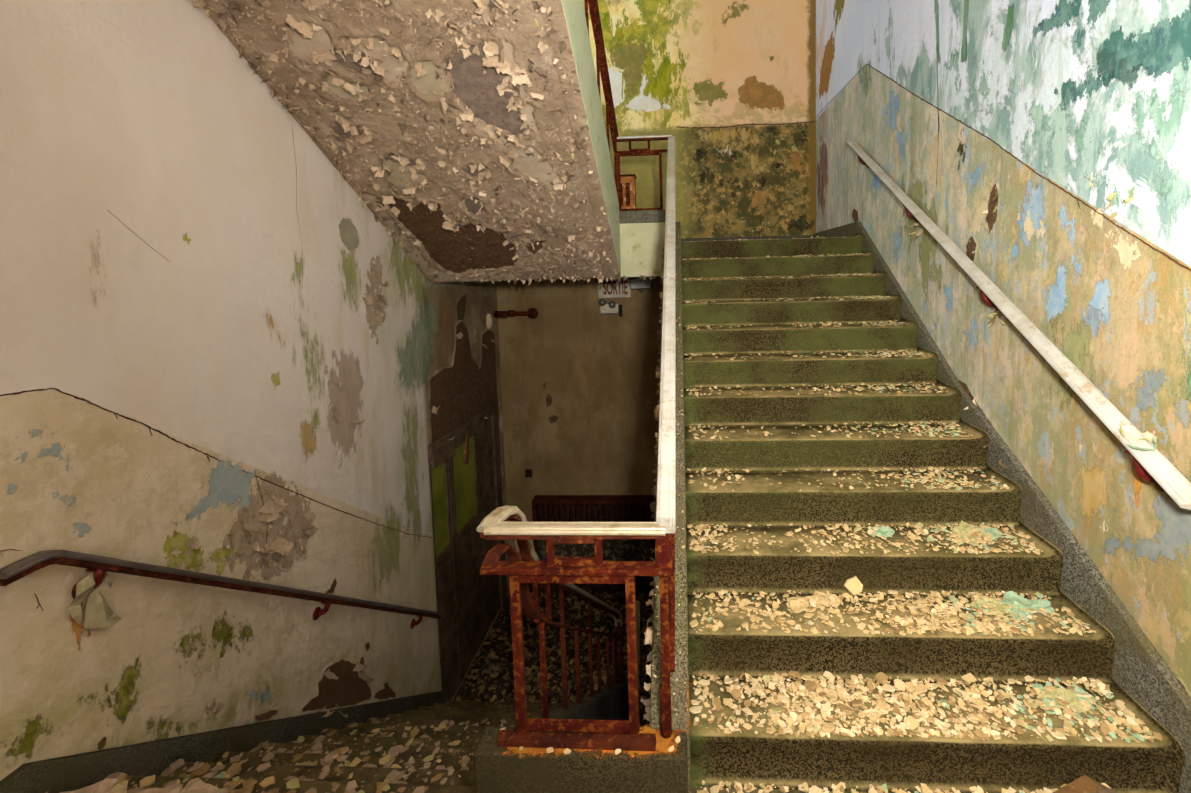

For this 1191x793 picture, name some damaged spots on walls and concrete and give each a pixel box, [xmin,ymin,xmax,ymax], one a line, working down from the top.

spalling [689,76,785,111]
spalling [192,0,671,519]
peeling [1042,172,1141,321]
peeling [1080,278,1112,339]
spalling [957,376,1015,455]
peeling [1120,425,1157,451]
peeling [1129,368,1168,411]
peeling [163,459,318,581]
peeling [1091,495,1191,567]
spalling [298,642,396,718]
peeling [640,576,654,722]
rust [502,682,691,759]